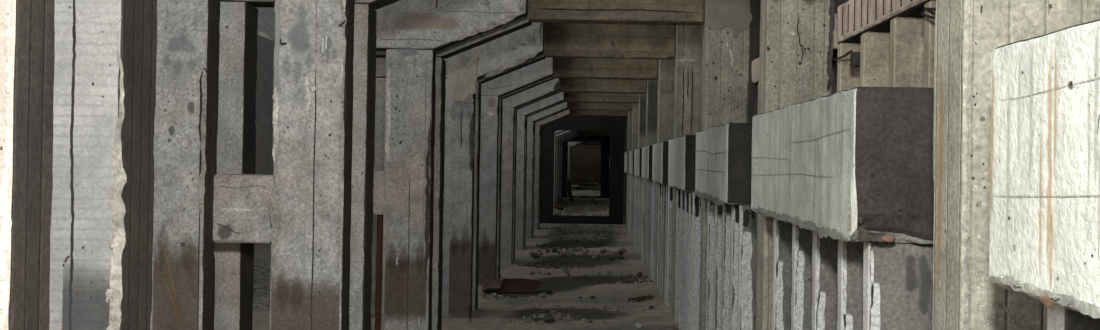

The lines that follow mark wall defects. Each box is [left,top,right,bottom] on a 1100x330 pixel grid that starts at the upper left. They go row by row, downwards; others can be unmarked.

crack [797,0,825,80]
spalling [0,0,12,330]
crack [65,0,122,286]
spalling [105,21,127,330]
crack [198,205,242,260]
crack [198,68,267,194]
spalling [975,269,1100,330]